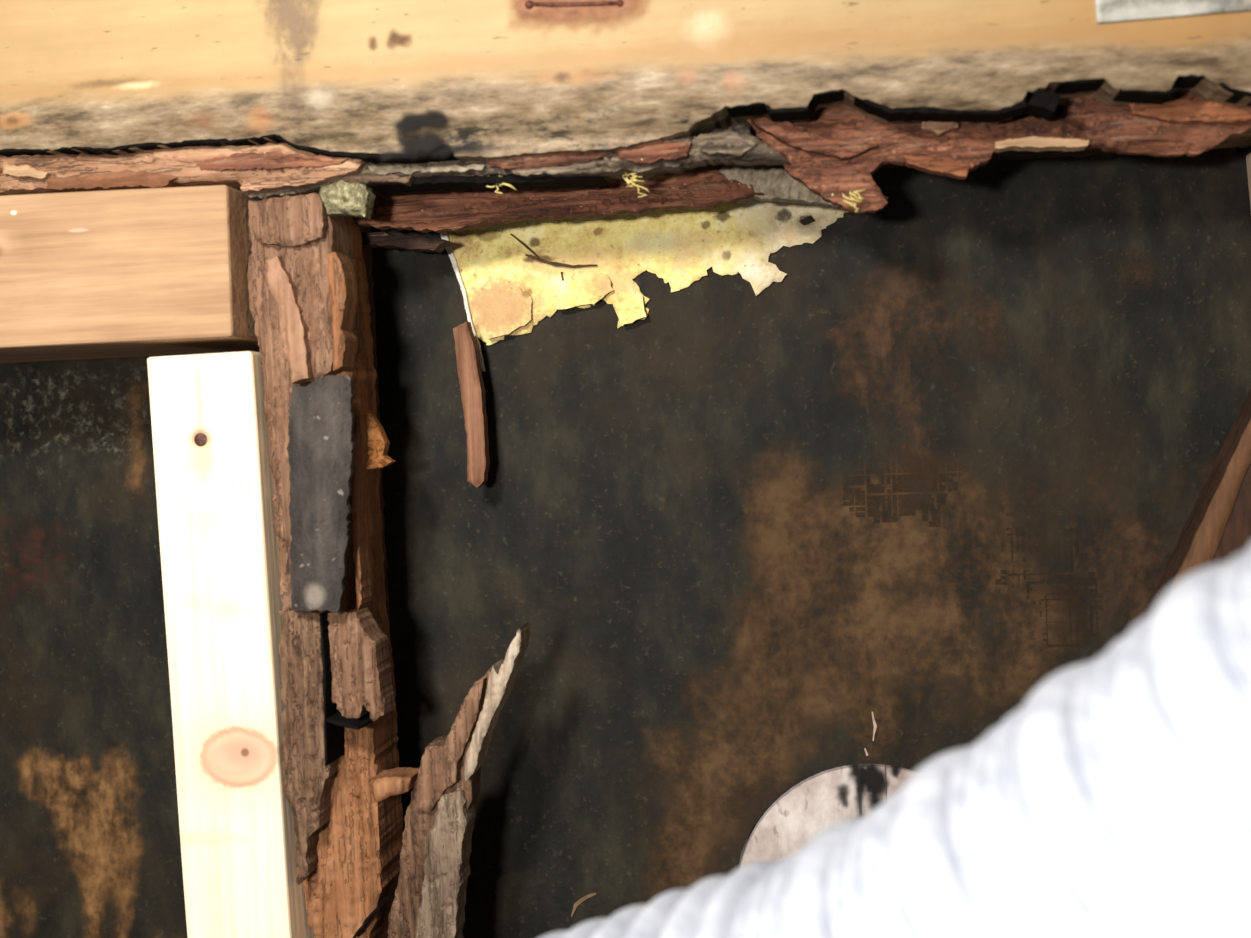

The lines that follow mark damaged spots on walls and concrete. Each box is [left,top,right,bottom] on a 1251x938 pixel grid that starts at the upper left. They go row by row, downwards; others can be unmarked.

rust [515,0,641,23]
spalling [380,110,480,160]
peeling [440,198,848,371]
damp [860,277,917,367]
damp [1093,521,1158,622]
crack [319,611,372,766]
damp [653,427,1063,892]
peeling [368,677,487,812]
crack [353,887,397,938]